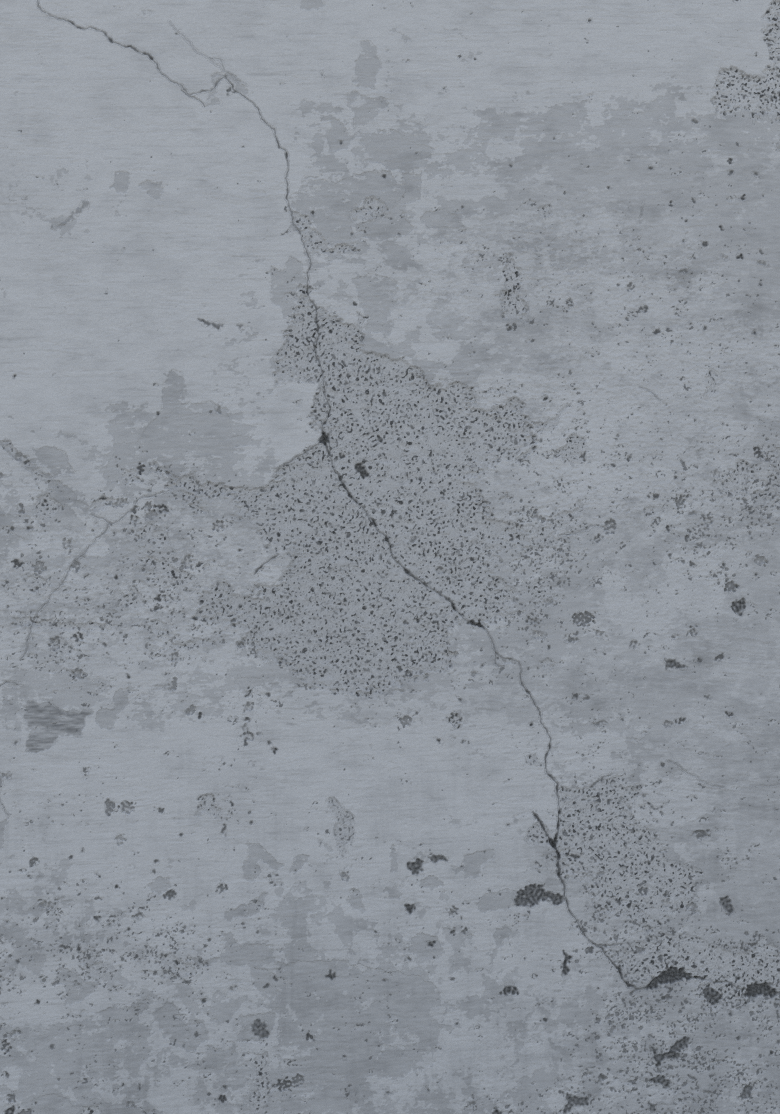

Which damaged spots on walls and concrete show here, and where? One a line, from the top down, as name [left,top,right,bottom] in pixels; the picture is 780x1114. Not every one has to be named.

spalling [710,0,780,125]
spalling [0,40,609,699]
crack [36,0,650,992]
crack [0,490,165,688]
spalling [721,561,739,594]
peeling [23,673,131,754]
spalling [185,704,204,719]
spalling [240,686,270,747]
spalling [399,713,412,728]
spalling [446,696,465,728]
spalling [525,775,780,1017]
crack [694,975,780,995]